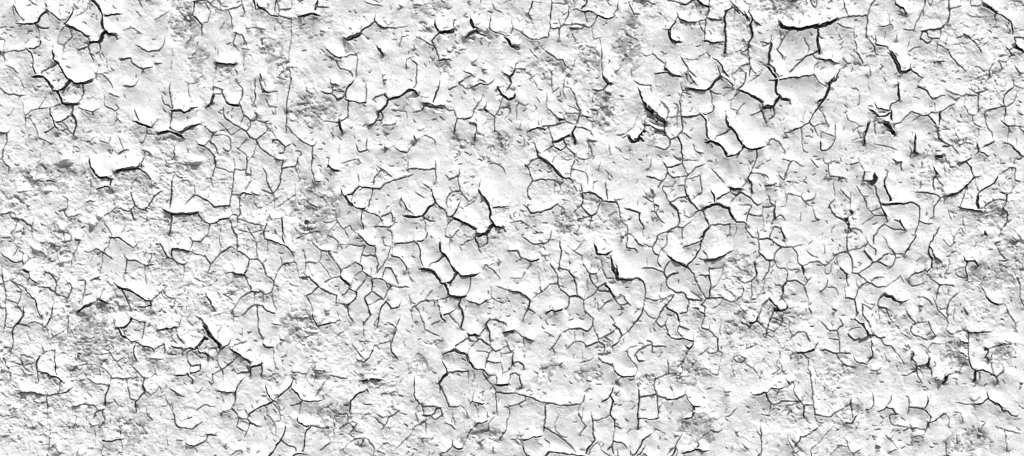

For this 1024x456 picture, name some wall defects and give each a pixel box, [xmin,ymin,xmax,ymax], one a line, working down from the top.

crack [0,0,127,158]
crack [120,38,173,87]
crack [179,0,329,182]
crack [319,48,367,150]
crack [343,0,466,66]
crack [589,34,613,102]
crack [84,158,118,197]
crack [0,211,113,422]
crack [979,268,1018,332]
crack [401,373,443,444]
crack [668,409,736,456]
crack [965,392,1024,417]